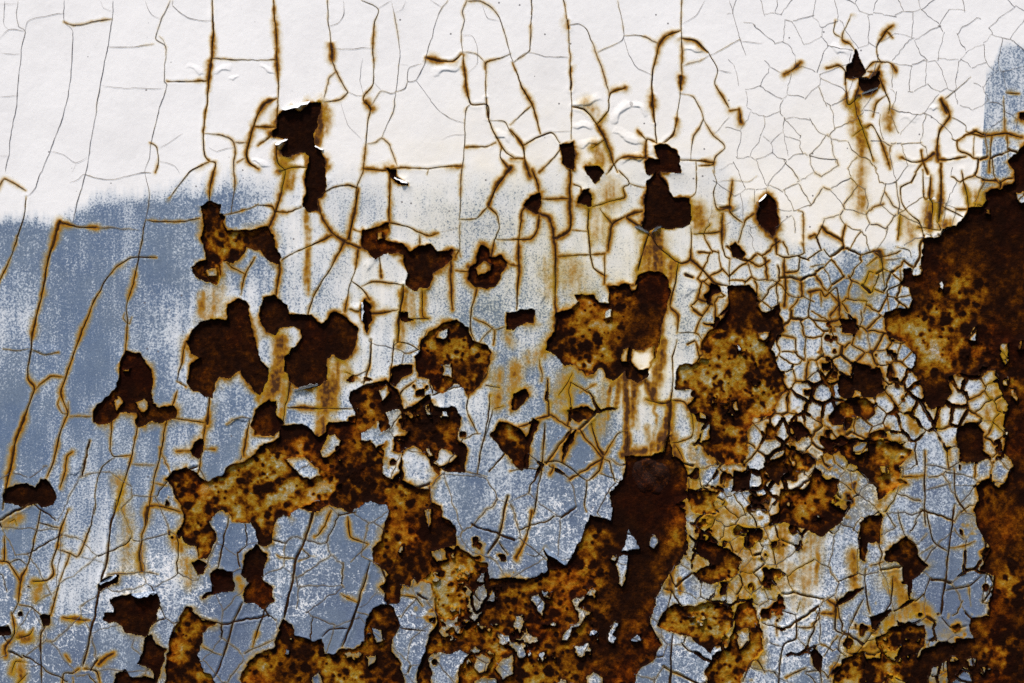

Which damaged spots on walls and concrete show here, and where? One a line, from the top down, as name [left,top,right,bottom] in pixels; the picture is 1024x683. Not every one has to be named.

rust [279,101,331,191]
crack [274,0,845,477]
rust [848,100,867,214]
crack [771,18,1024,310]
crack [0,0,307,683]
rust [256,334,290,419]
rust [314,360,373,437]
crack [487,422,628,562]
peeling [92,140,1024,683]
rust [591,315,1016,675]
crack [202,509,370,677]
crack [743,560,893,683]